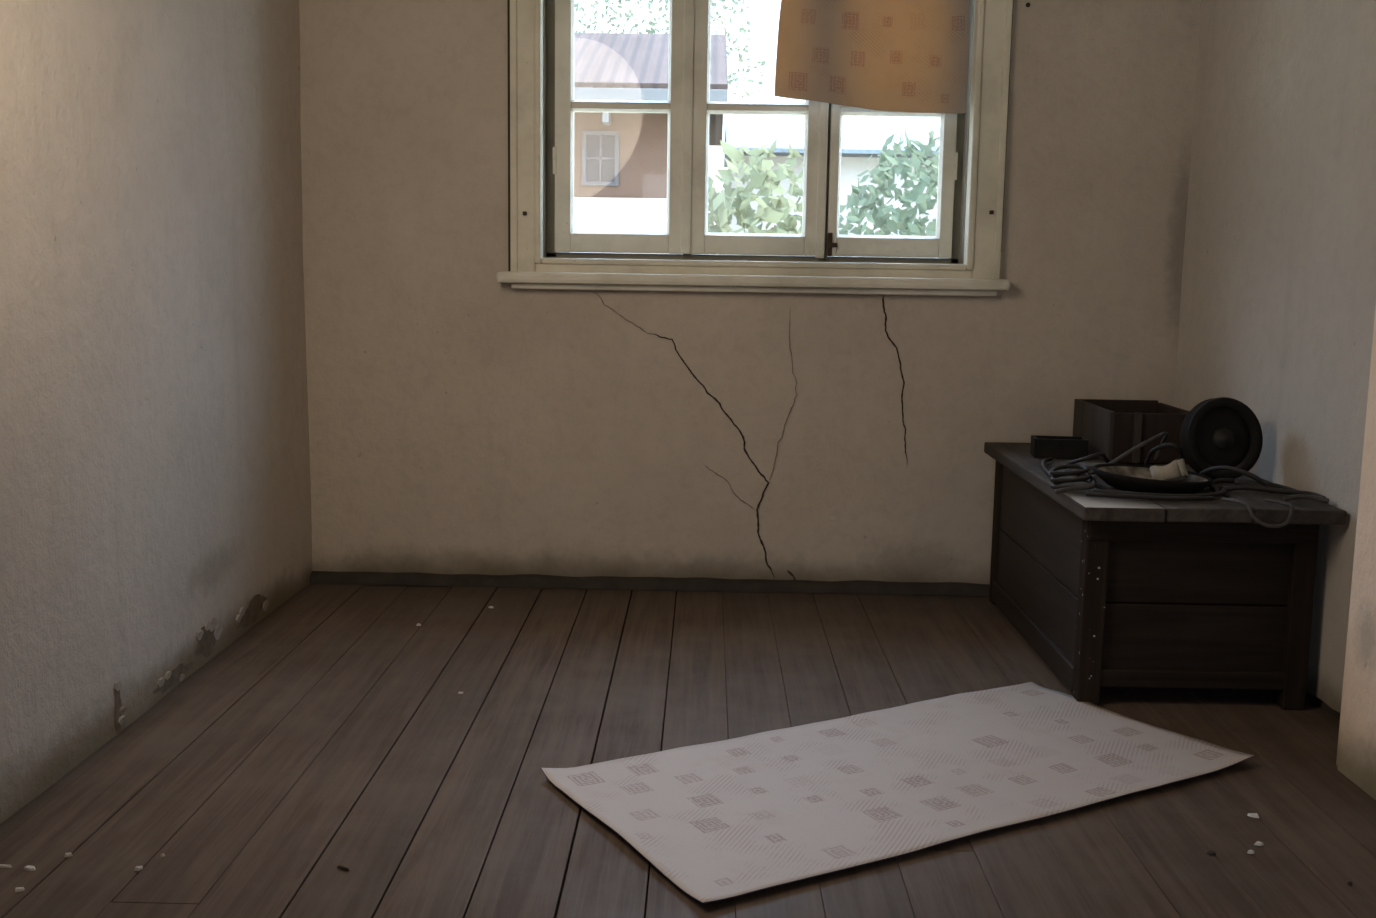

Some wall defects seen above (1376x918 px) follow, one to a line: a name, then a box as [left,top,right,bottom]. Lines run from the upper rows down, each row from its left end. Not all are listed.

crack [596,293,797,580]
crack [882,295,908,461]